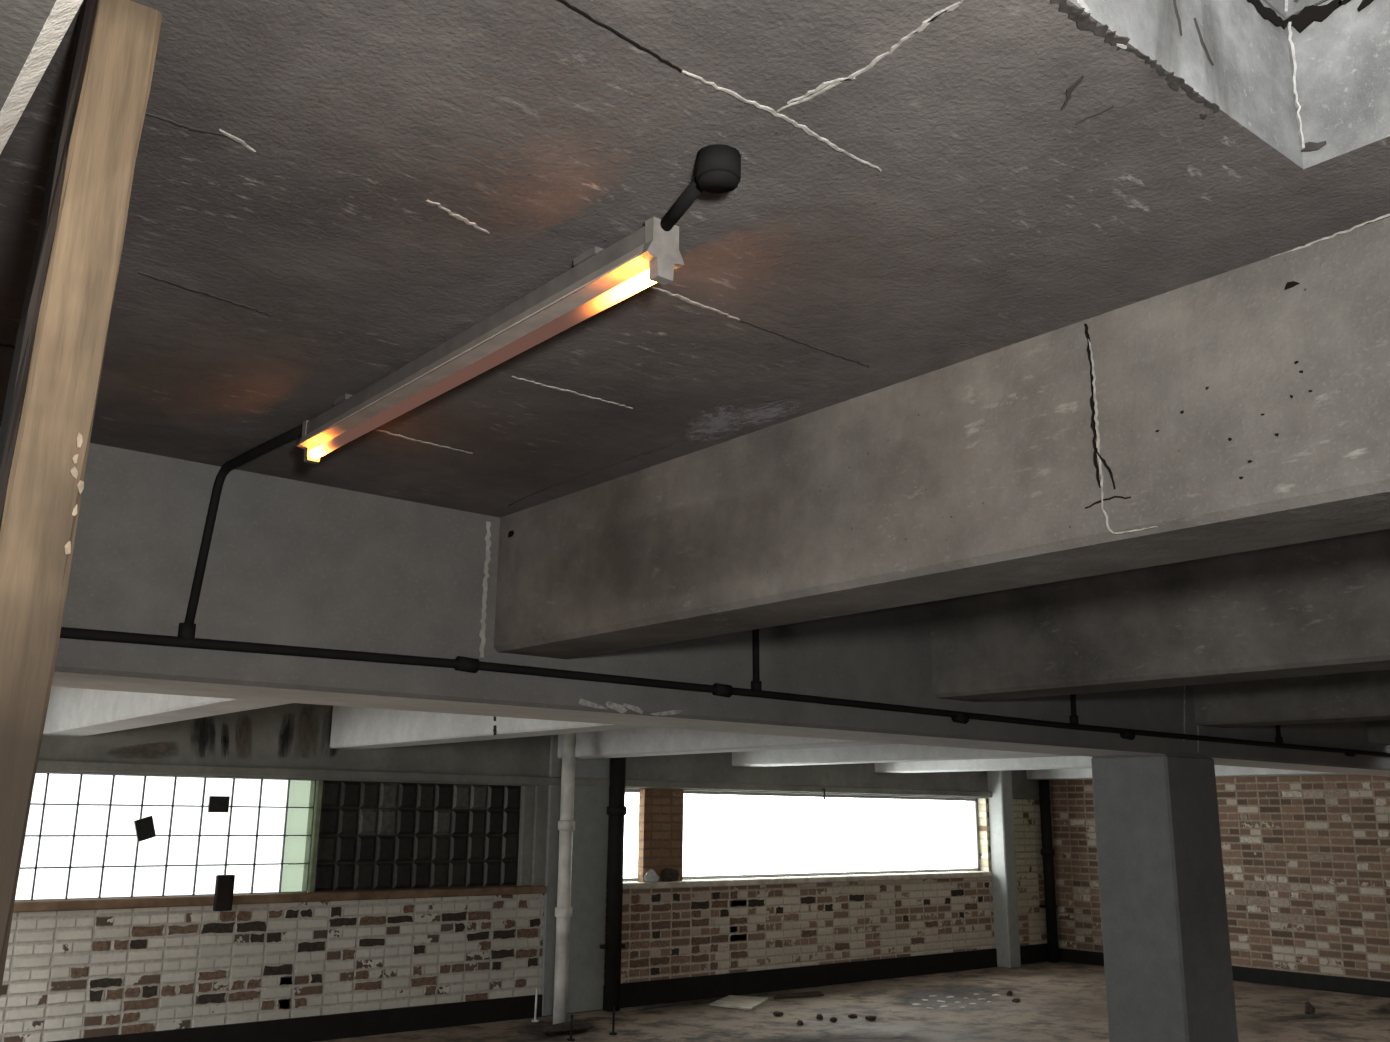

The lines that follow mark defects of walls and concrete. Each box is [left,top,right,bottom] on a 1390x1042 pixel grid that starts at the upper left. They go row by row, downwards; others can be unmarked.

crack [558,0,964,172]
crack [1061,75,1114,125]
spalling [1050,0,1220,119]
crack [1173,0,1214,66]
crack [1247,0,1374,152]
crack [1084,323,1158,534]